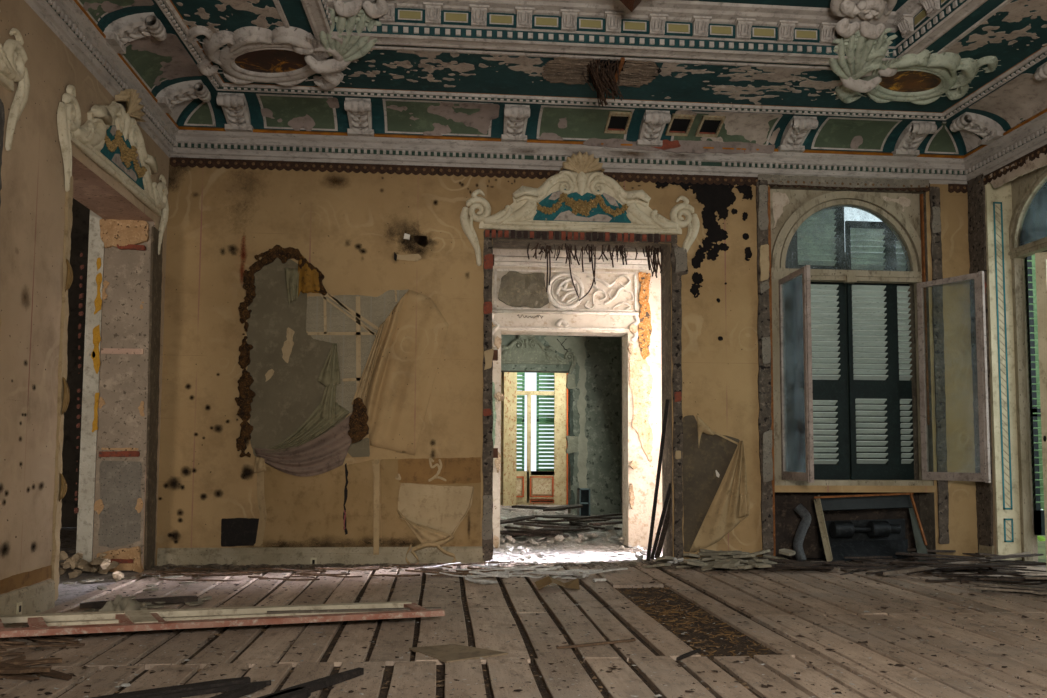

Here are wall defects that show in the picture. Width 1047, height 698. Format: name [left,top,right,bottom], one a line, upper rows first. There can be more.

peeling [83,0,154,16]
peeling [177,0,284,33]
peeling [945,0,1047,54]
peeling [348,49,545,87]
peeling [261,108,315,131]
peeling [387,102,500,136]
peeling [583,63,843,154]
mould [655,174,753,298]
peeling [282,327,295,363]